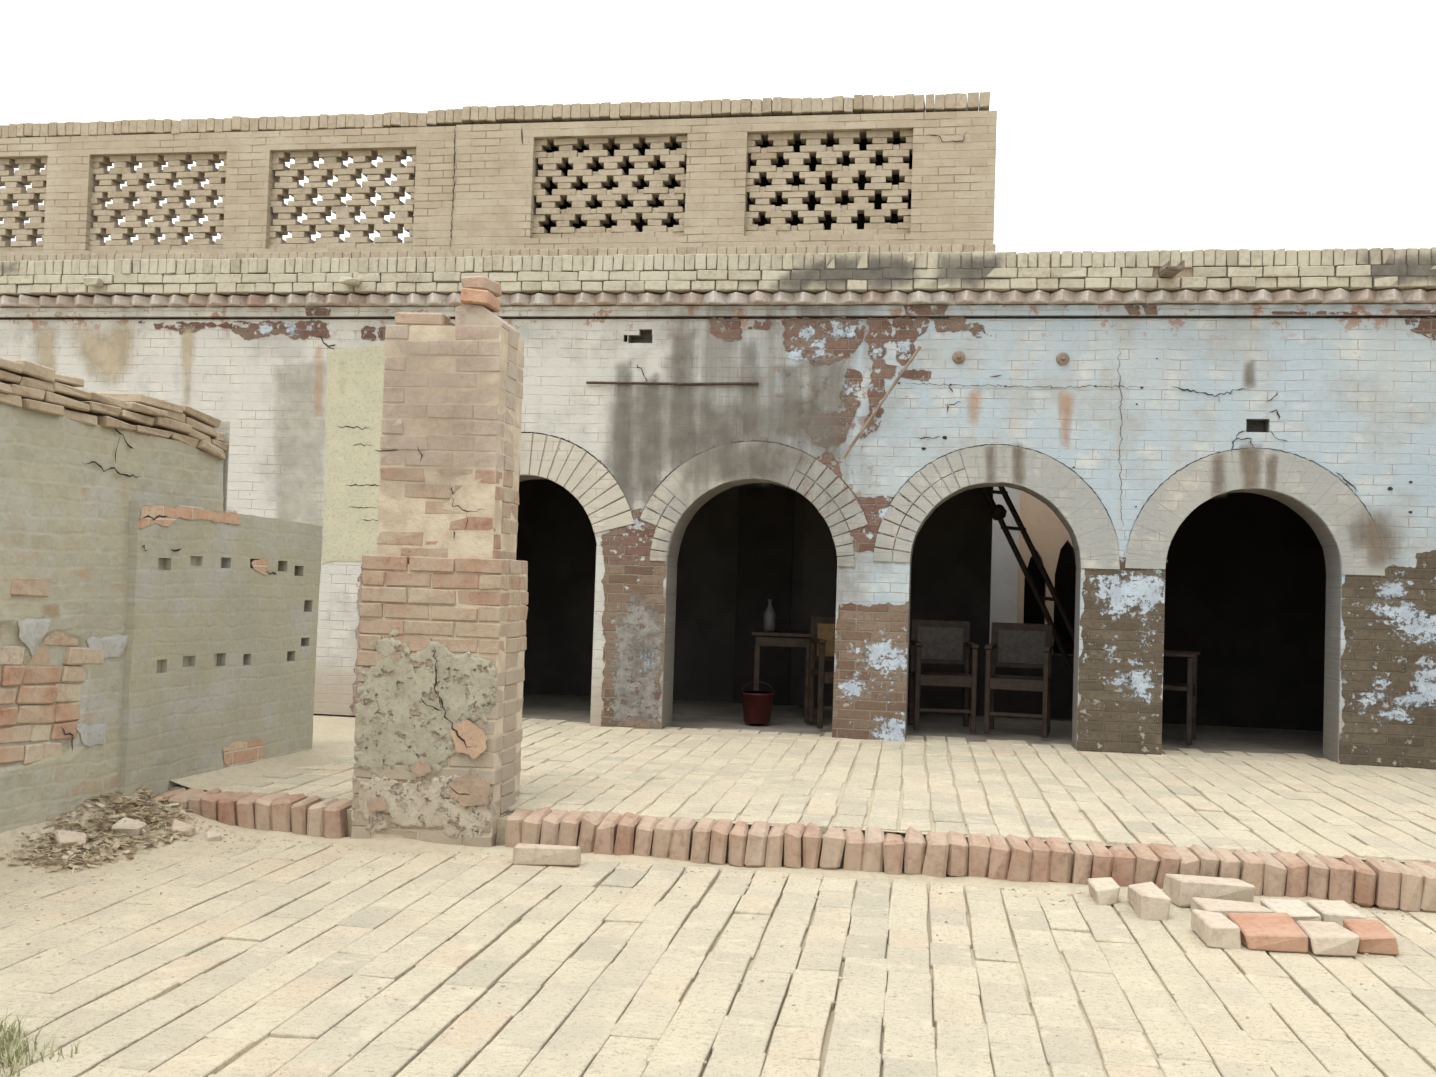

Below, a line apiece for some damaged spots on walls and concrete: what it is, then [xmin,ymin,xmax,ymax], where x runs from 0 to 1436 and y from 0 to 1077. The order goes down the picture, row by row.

peeling [138,307,331,340]
peeling [1395,309,1436,340]
crack [87,428,140,478]
peeling [709,306,991,552]
crack [142,515,182,552]
spalling [0,618,128,765]
spalling [349,565,498,839]
peeling [601,508,668,729]
peeling [832,601,909,742]
peeling [1077,557,1168,755]
peeling [1339,550,1436,770]